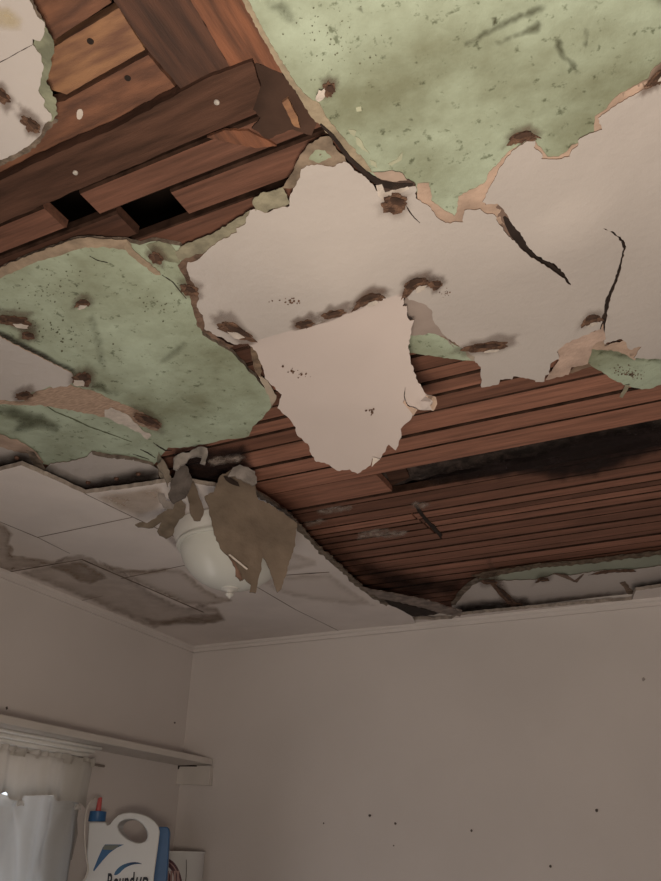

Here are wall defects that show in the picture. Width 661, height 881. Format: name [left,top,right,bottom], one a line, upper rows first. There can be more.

crack [320,124,420,223]
peeling [0,0,661,484]
crack [503,216,570,284]
crack [600,229,625,332]
leakage [433,429,661,481]
peeling [451,550,661,609]